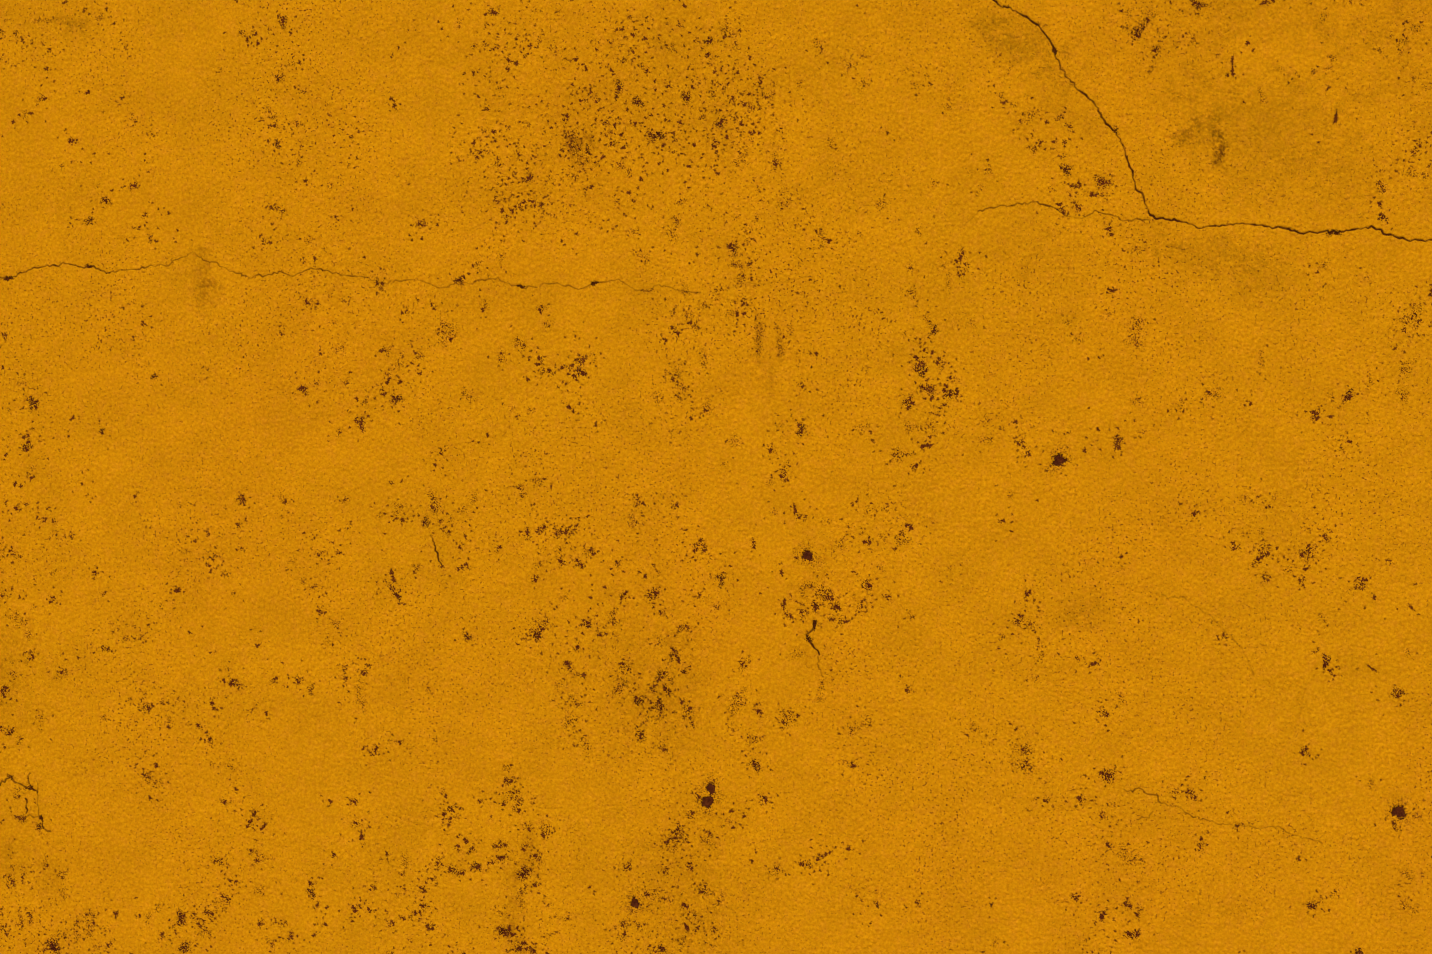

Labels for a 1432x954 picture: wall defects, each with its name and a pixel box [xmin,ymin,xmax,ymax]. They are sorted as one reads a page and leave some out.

crack [993,0,1432,242]
crack [4,258,180,281]